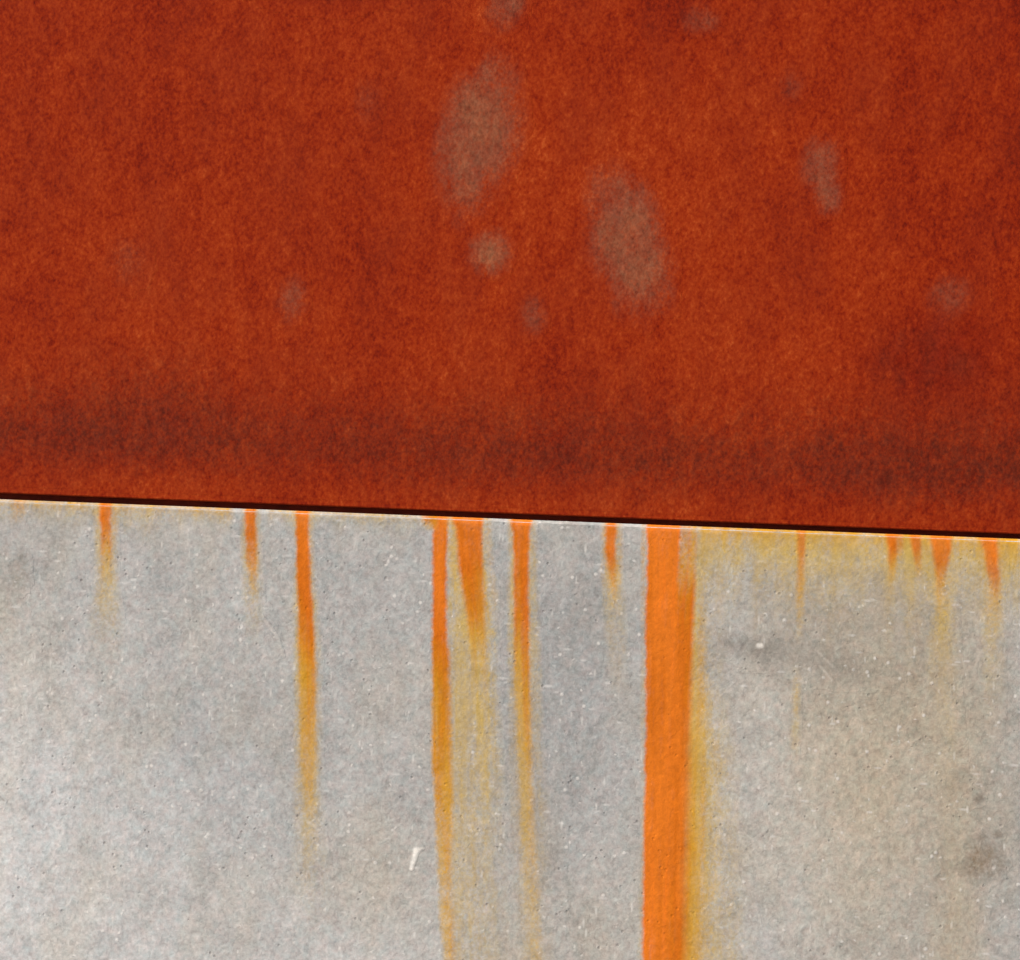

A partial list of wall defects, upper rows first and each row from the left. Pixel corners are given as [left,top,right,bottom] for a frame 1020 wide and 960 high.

corrosion [0,499,557,960]
corrosion [598,523,1020,960]